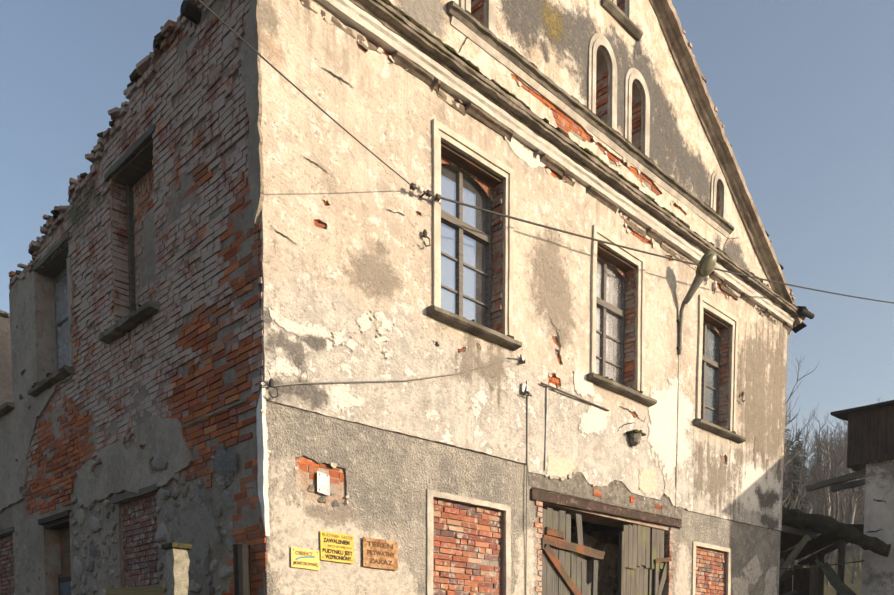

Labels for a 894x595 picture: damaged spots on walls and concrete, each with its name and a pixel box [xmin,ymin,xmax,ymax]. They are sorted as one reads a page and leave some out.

spalling [505,74,661,196]
spalling [25,396,97,515]
spalling [232,426,271,595]
spalling [167,183,397,488]
spalling [294,457,349,507]
spalling [548,335,562,389]
peeling [528,369,694,519]
damp [693,319,791,518]